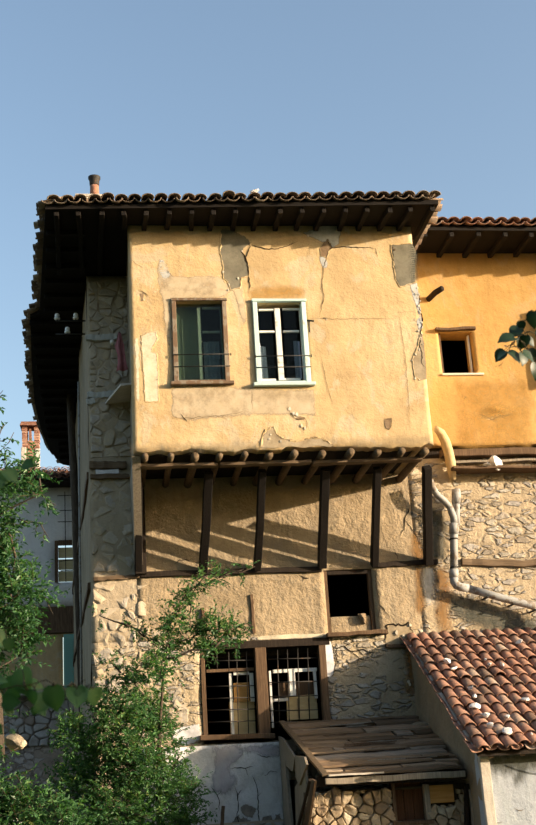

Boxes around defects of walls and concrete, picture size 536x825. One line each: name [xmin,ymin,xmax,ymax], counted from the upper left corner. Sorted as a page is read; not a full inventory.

flaking render [134,229,251,403]
crack [241,242,295,288]
flaking render [304,226,341,268]
crack [312,246,419,428]
flaking render [390,242,427,381]
flaking render [172,386,333,448]